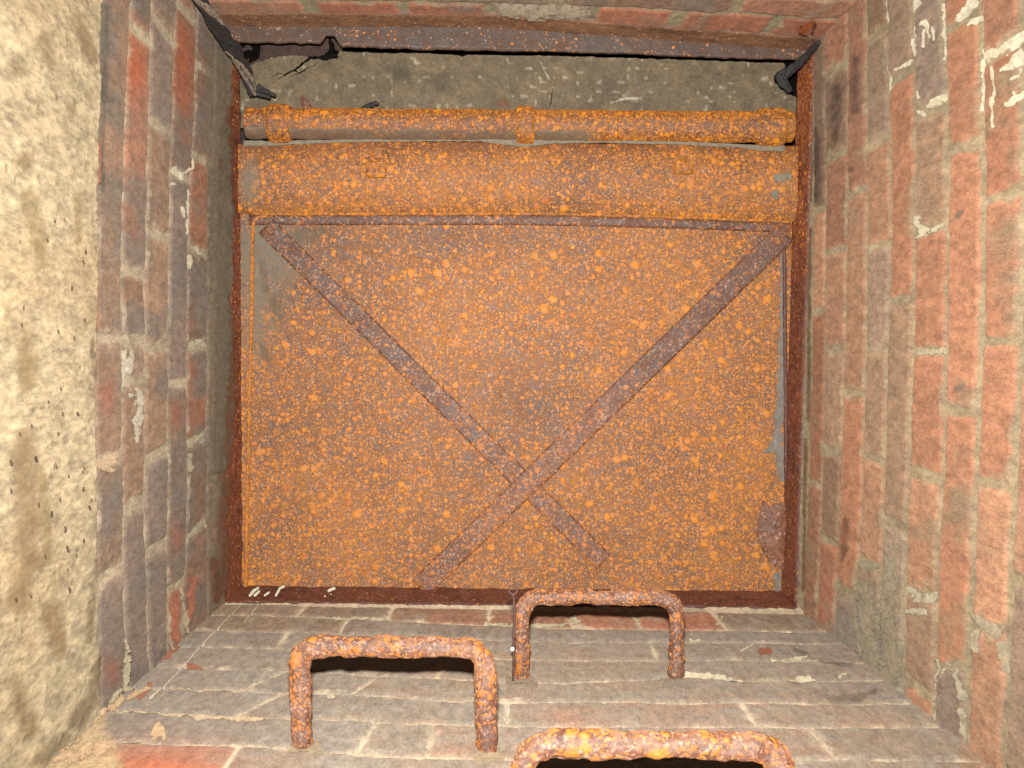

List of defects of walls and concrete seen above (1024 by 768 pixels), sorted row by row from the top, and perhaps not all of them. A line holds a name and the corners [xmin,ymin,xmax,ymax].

crack [272,53,338,79]
damp [916,91,948,117]
damp [887,0,984,91]
damp [980,30,1024,128]
corrosion [757,501,787,569]